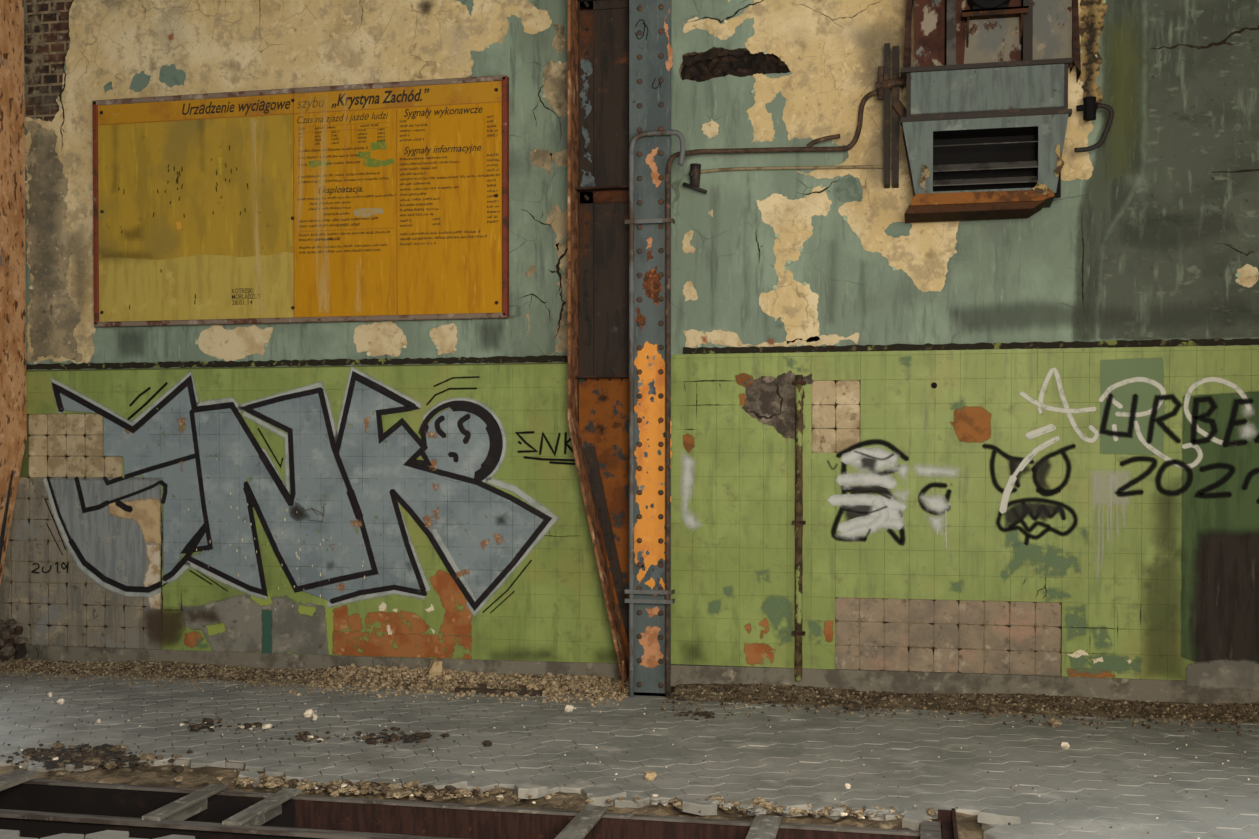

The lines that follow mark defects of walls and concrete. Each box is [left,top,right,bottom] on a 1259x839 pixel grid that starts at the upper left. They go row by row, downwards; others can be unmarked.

peeling [24,0,568,365]
crack [684,0,763,25]
peeling [681,0,960,351]
peeling [1061,0,1108,181]
crack [1150,26,1259,49]
peeling [742,370,861,453]
peeling [0,414,162,649]
peeling [333,570,478,659]